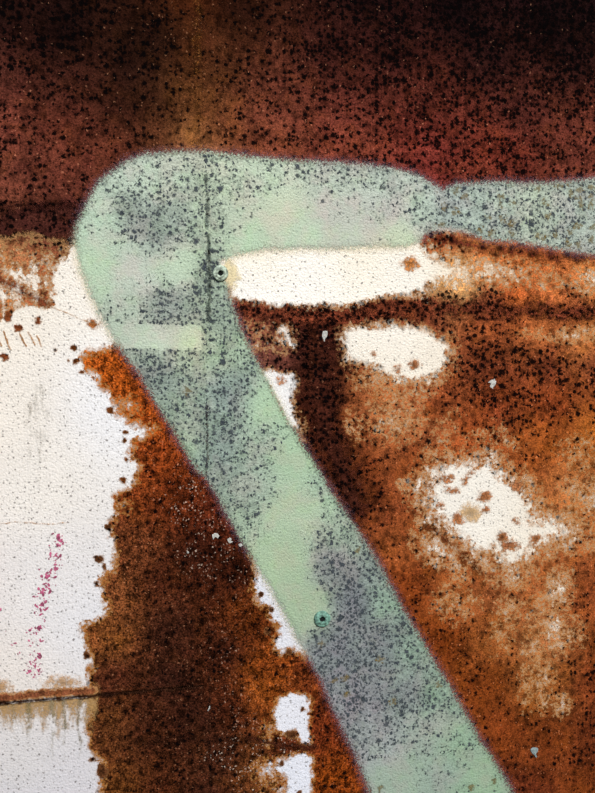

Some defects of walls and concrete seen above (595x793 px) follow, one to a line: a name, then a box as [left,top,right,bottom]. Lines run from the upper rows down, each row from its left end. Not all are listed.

corrosion [0,0,595,362]
corrosion [0,342,372,793]
corrosion [223,230,595,793]